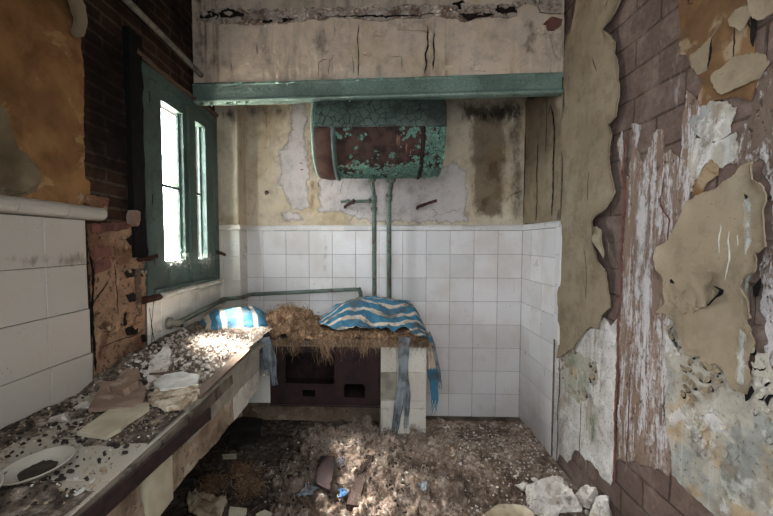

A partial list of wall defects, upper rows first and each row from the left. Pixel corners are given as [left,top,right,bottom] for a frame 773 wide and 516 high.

flaking render [0,0,147,379]
peeling [195,0,621,404]
peeling [653,0,773,468]